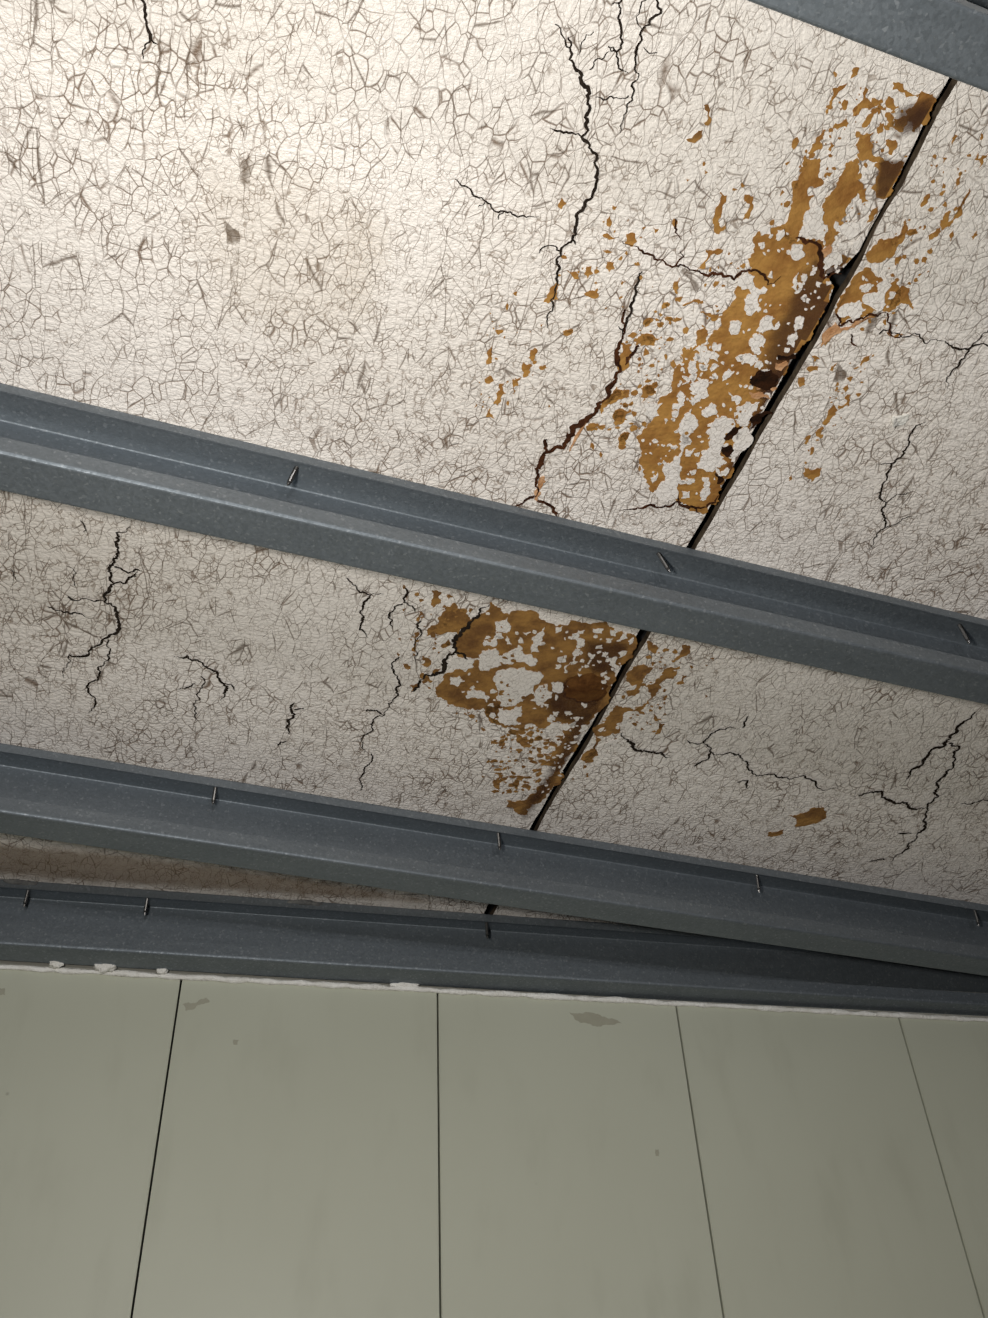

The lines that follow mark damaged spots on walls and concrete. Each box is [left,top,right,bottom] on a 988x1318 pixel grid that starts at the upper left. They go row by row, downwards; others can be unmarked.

crack [141,0,157,57]
crack [455,0,662,327]
corrosion [877,161,902,196]
corrosion [898,103,929,130]
crack [511,219,781,516]
corrosion [749,258,848,432]
crack [835,312,988,386]
crack [868,422,925,550]
crack [47,520,140,712]
corrosion [590,644,622,670]
corrosion [529,684,595,807]
crack [621,712,988,863]